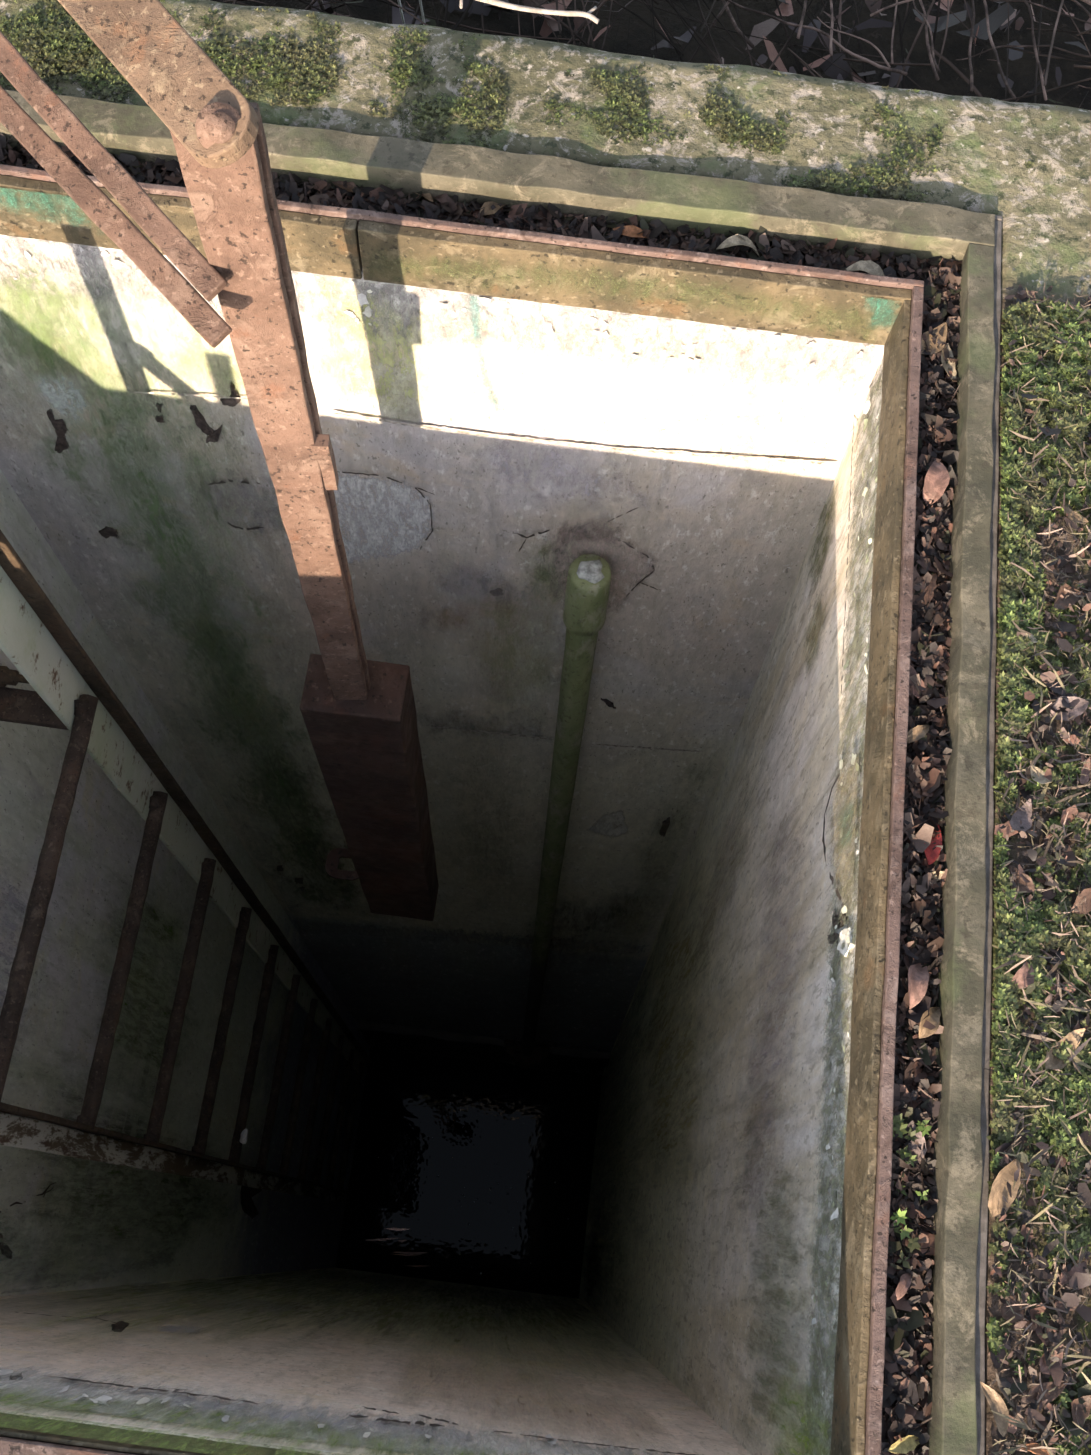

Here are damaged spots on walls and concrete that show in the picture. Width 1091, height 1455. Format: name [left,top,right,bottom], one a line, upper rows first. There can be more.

peeling [41,382,83,453]
peeling [155,403,165,423]
peeling [190,405,222,443]
peeling [220,381,241,407]